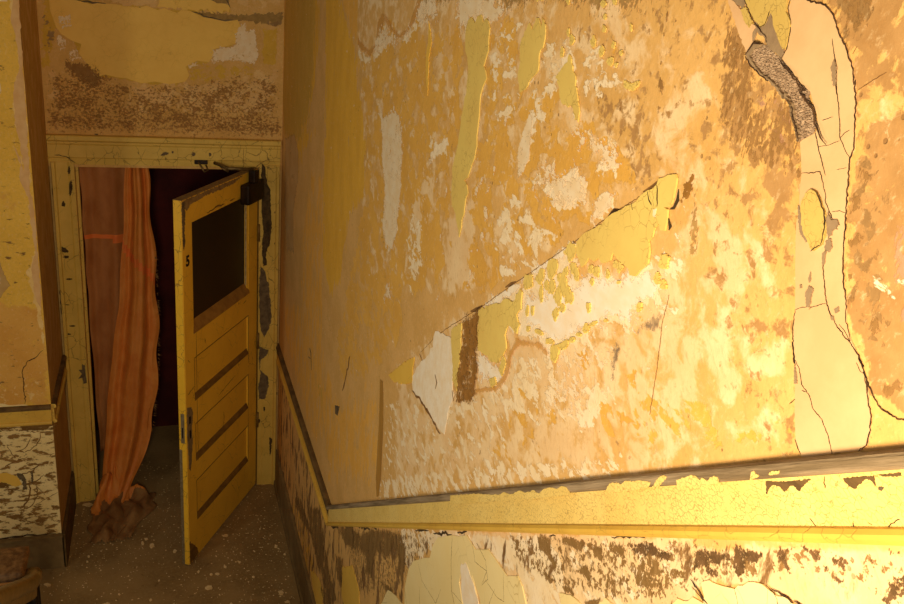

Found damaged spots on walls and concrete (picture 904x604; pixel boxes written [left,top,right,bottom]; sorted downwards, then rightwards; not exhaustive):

peeling [49,0,283,84]
damp [48,59,298,253]
peeling [470,18,679,426]
flaking render [728,0,872,457]
crack [744,0,904,452]
crack [22,350,43,402]
flaking render [388,323,462,434]
crack [649,296,669,415]
peeling [606,475,720,492]
peeling [750,471,811,494]
peeling [843,472,902,491]
peeling [673,580,796,604]